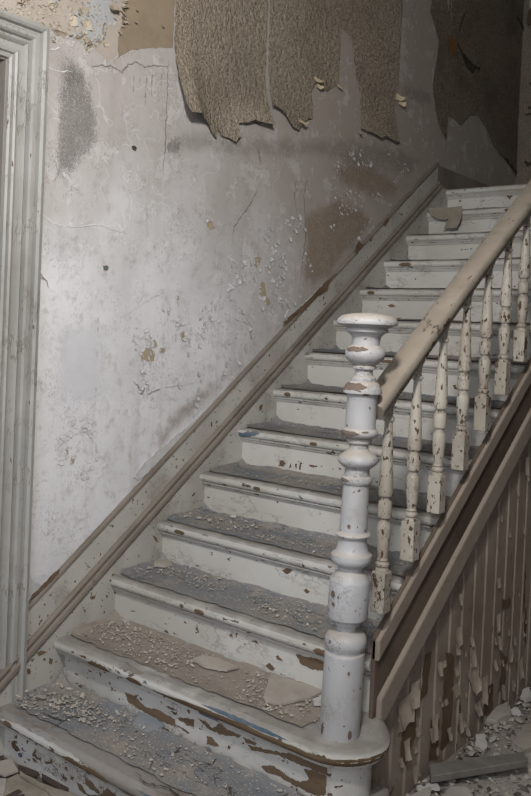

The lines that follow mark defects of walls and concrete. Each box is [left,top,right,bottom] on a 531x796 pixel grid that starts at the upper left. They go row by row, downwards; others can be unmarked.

peeling [0,0,124,61]
crack [92,61,169,175]
crack [135,742,217,796]
peeling [125,693,327,796]